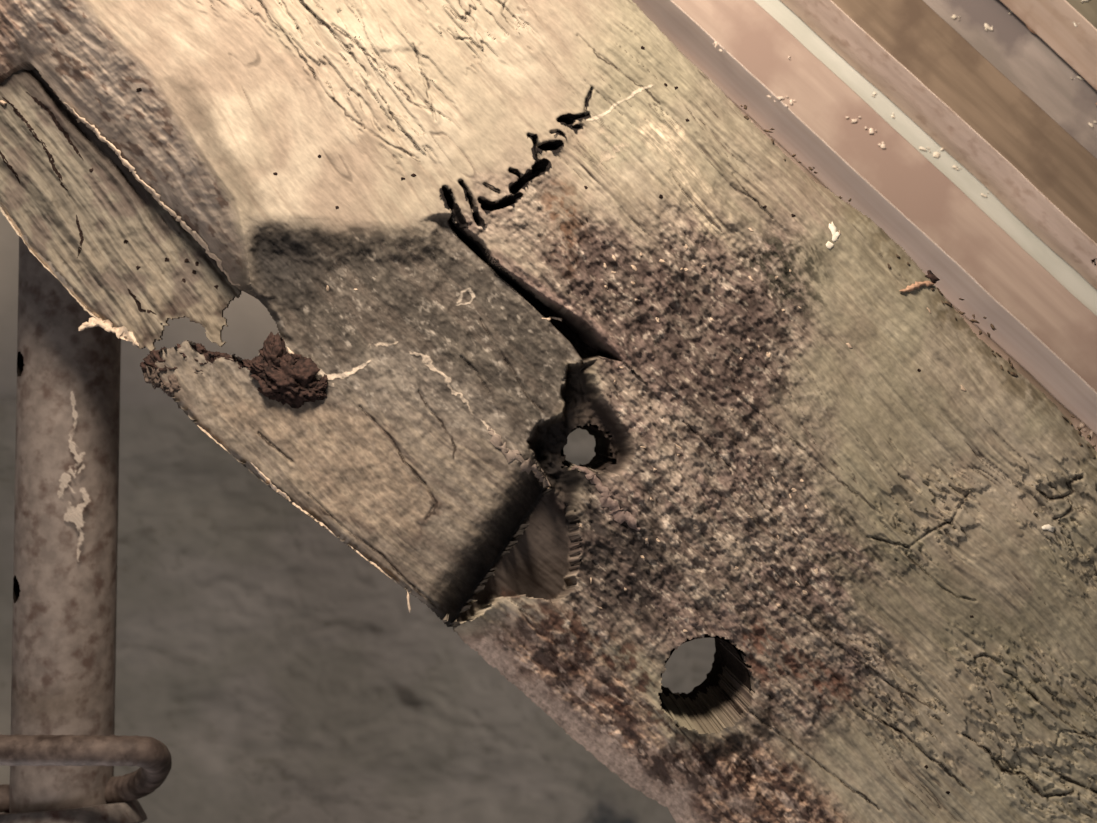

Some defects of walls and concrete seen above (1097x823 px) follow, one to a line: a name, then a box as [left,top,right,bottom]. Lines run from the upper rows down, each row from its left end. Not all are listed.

crack [300,0,432,111]
crack [0,92,83,191]
crack [439,87,648,386]
crack [128,289,156,314]
peeling [318,360,371,387]
water stain [255,232,602,487]
peeling [410,351,470,408]
water stain [546,249,773,429]
peeling [480,419,551,488]
peeling [571,465,640,531]
water stain [569,499,667,623]
crack [978,689,1095,797]